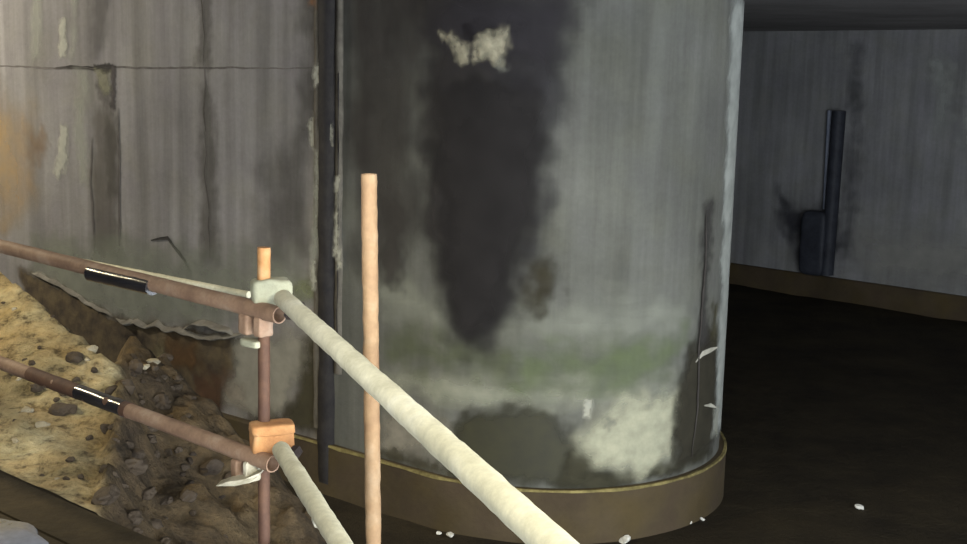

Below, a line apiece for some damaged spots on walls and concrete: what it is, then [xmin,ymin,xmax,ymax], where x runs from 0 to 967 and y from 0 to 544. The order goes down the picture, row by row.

water stain [59,18,67,57]
spalling [438,25,508,64]
water stain [55,126,67,178]
crack [0,0,310,265]
water stain [351,0,569,346]
water stain [330,126,341,302]
water stain [46,265,219,318]
water stain [92,243,257,290]
water stain [270,266,316,296]
water stain [416,0,745,489]
spalling [19,268,243,409]
water stain [380,417,454,477]